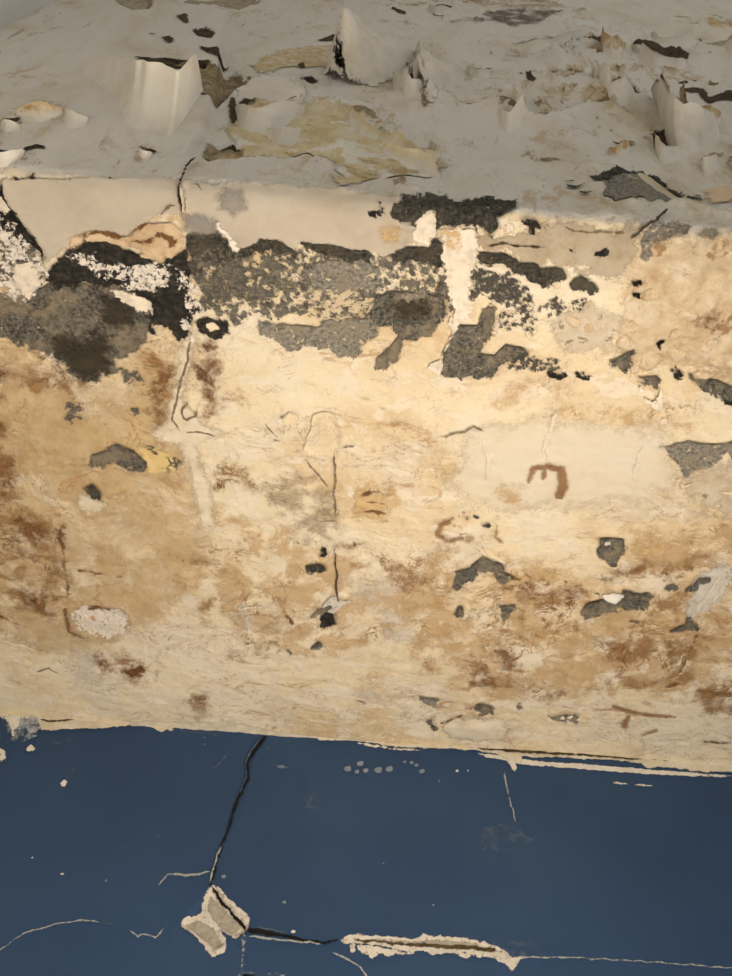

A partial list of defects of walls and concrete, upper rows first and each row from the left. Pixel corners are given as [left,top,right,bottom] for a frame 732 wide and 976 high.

peeling [80,0,318,146]
spalling [0,140,732,386]
water stain [0,182,230,652]
water stain [354,482,398,523]
water stain [528,464,568,499]
water stain [199,509,732,715]
crack [159,734,267,886]
crack [0,919,164,950]
spalling [181,883,255,976]
crack [247,926,367,976]
spalling [341,933,525,972]
crack [521,956,732,968]